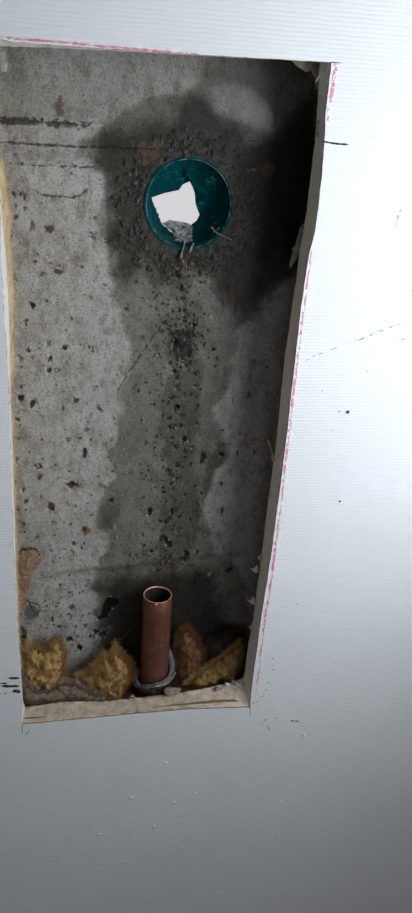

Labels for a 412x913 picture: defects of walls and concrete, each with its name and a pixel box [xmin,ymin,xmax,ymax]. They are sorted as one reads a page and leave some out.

leakage [103,102,311,310]
leakage [101,572,224,669]